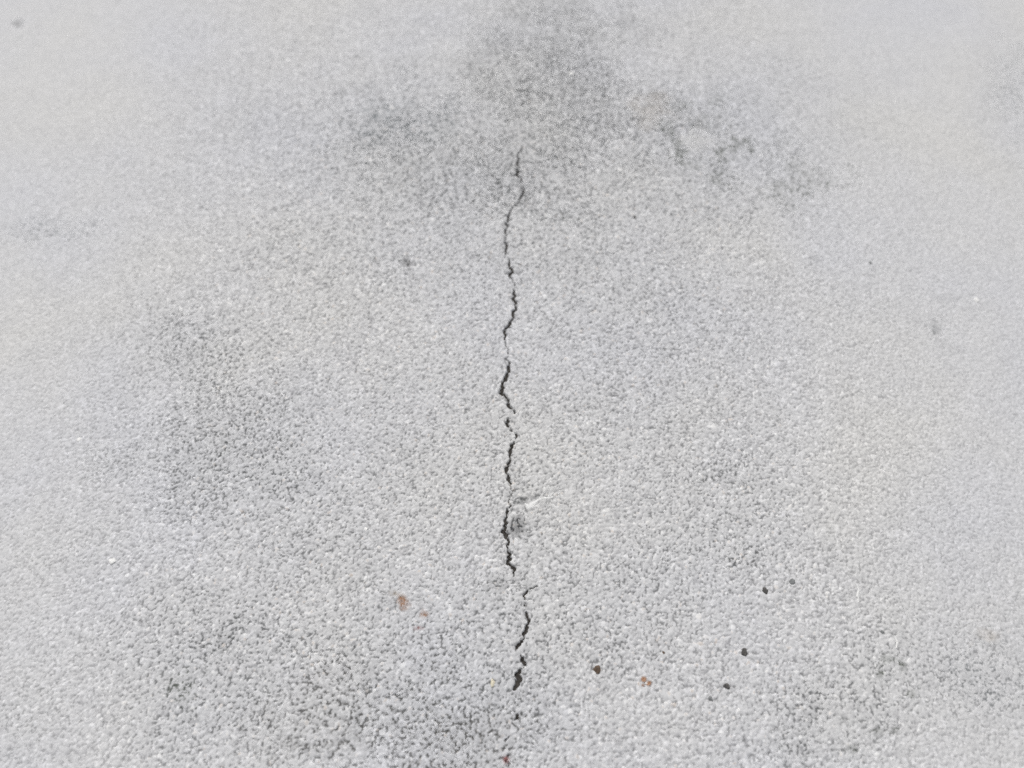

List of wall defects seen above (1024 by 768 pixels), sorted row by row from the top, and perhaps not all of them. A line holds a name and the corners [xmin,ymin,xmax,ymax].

crack [499,151,532,767]